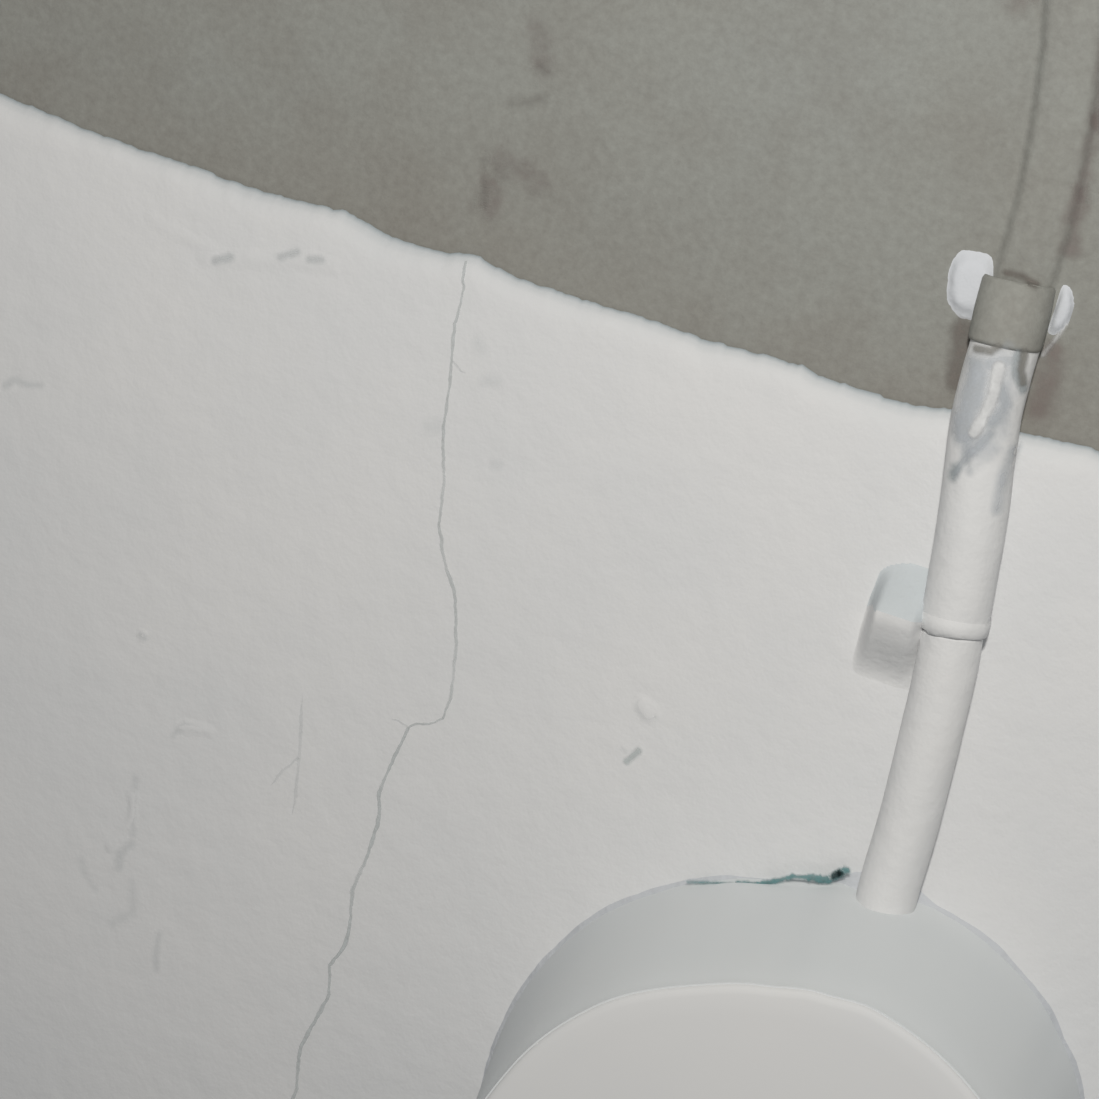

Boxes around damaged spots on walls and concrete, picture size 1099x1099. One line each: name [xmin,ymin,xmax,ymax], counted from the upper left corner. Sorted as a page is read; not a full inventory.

crack [442,261,467,458]
peeling [952,344,1028,478]
crack [438,503,457,640]
crack [363,689,453,864]
crack [291,896,353,1099]